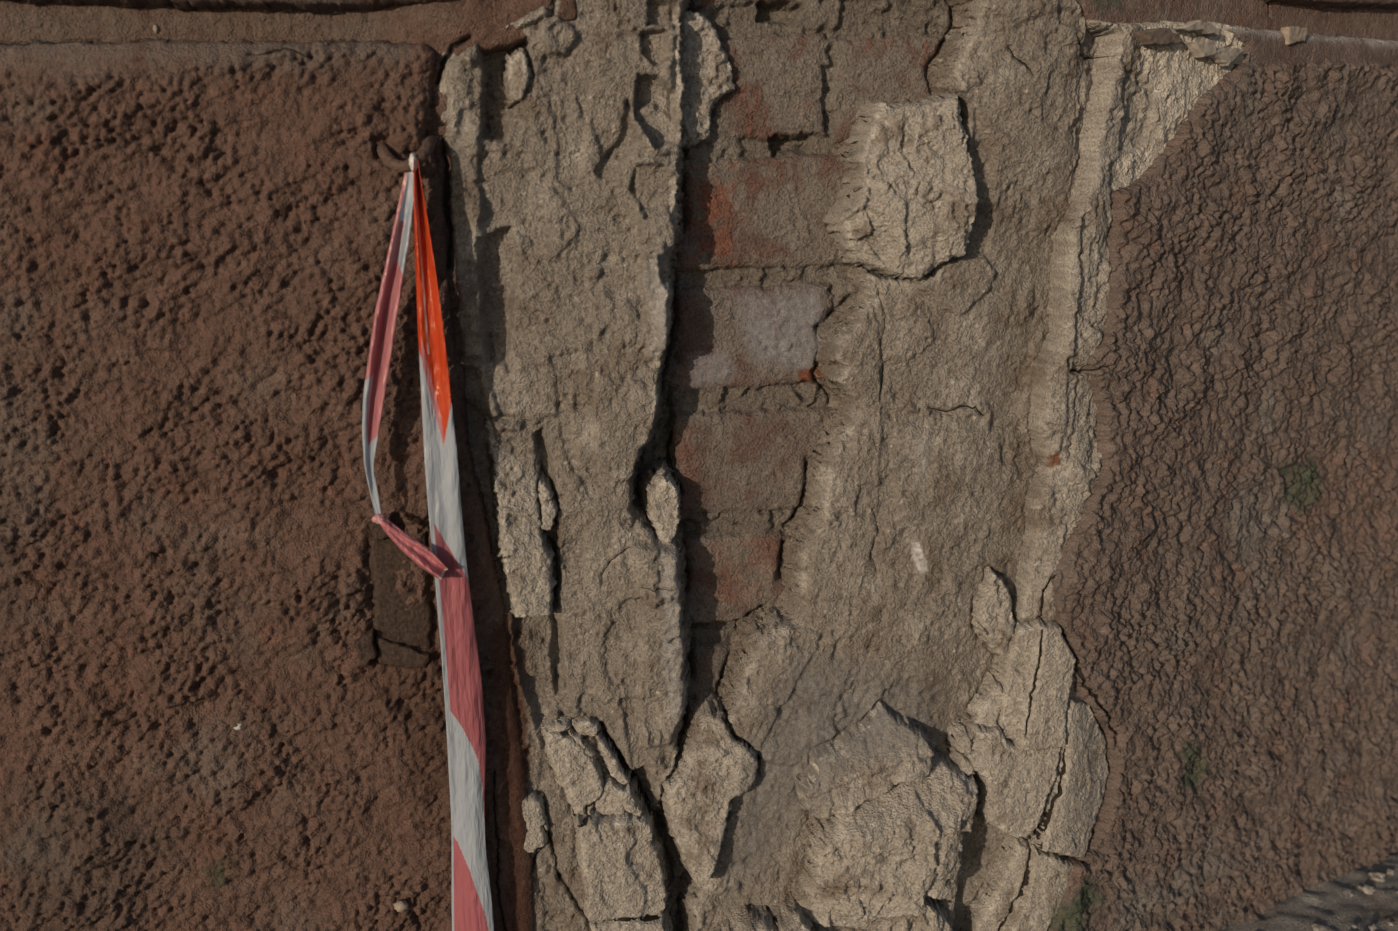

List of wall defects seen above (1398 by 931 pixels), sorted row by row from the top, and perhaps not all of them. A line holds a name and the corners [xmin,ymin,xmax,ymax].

crack [878,292,886,393]
crack [666,430,682,491]
spalling [437,0,1256,931]
crack [930,405,984,416]
crack [1025,574,1113,735]
crack [601,721,655,816]
crack [715,707,761,761]
crack [493,771,660,931]